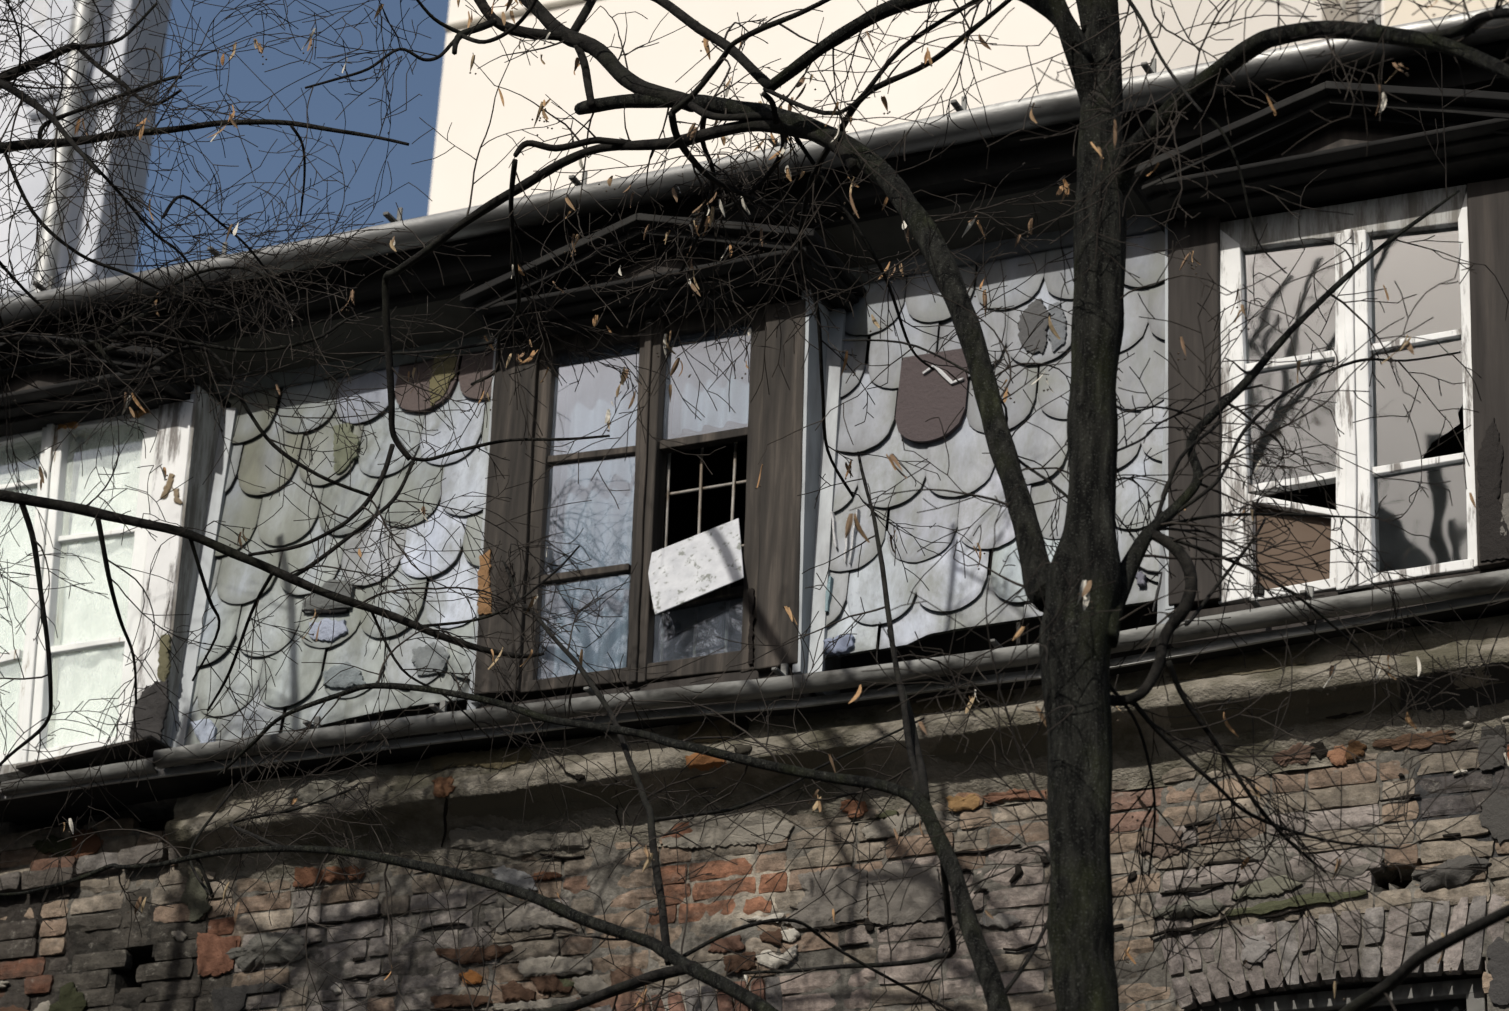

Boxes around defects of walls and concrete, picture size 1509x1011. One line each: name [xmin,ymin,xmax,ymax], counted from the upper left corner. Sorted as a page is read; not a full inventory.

spalling [1272,740,1367,767]
spalling [44,823,104,859]
spalling [1381,875,1412,890]
flaking render [196,933,237,977]
spalling [435,944,514,965]
spalling [708,929,783,974]
spalling [430,974,573,1009]